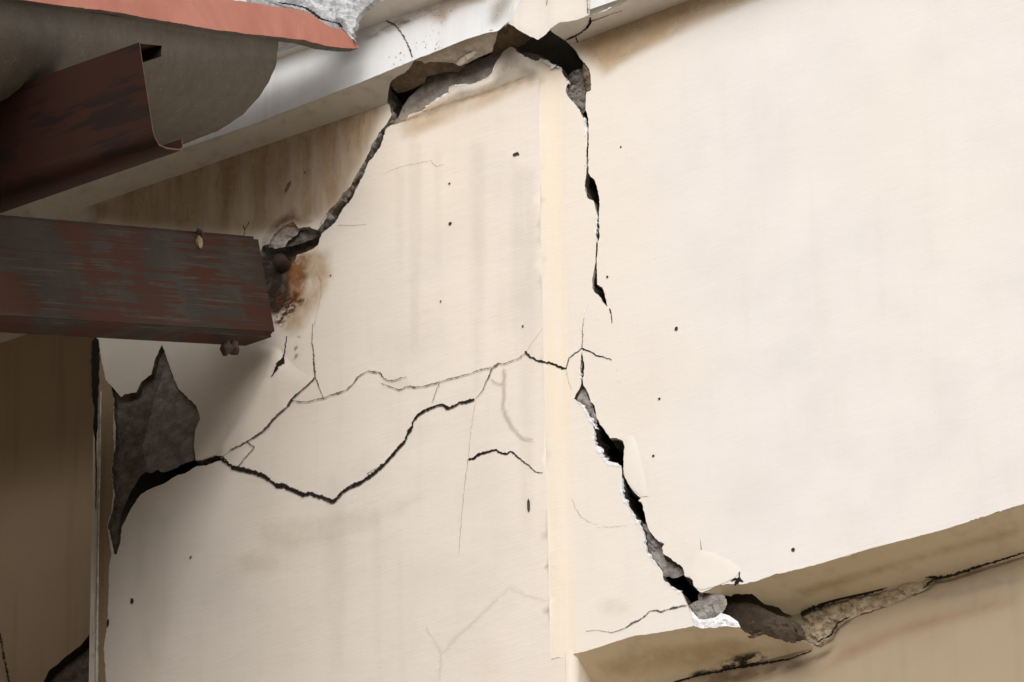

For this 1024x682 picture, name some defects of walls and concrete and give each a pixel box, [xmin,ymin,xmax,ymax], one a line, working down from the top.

crack [386,20,413,57]
peeling [390,0,590,125]
crack [243,87,403,263]
crack [516,0,623,323]
corrosion [261,255,306,324]
spalling [44,346,221,682]
crack [219,319,887,682]
spalling [802,579,935,646]
crack [923,552,1024,589]